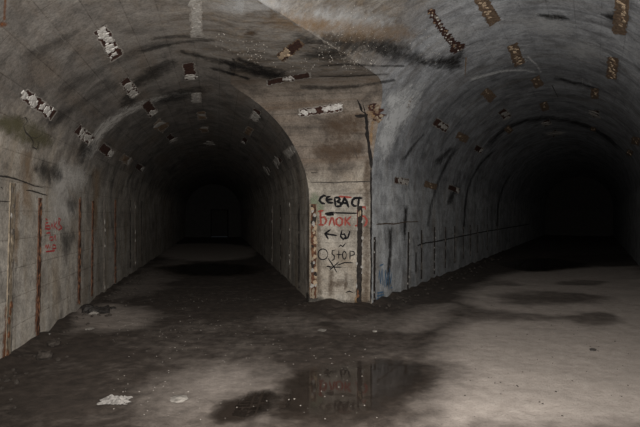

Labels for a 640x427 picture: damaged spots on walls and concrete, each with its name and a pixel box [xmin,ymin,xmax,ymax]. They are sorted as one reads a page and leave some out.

spalling [474,0,502,27]
spalling [612,0,629,35]
spalling [428,8,466,54]
spalling [93,24,124,62]
spalling [277,39,305,62]
spalling [119,77,140,99]
spalling [182,62,197,81]
spalling [266,72,311,86]
spalling [20,89,57,121]
spalling [298,103,343,118]
spalling [74,124,96,146]